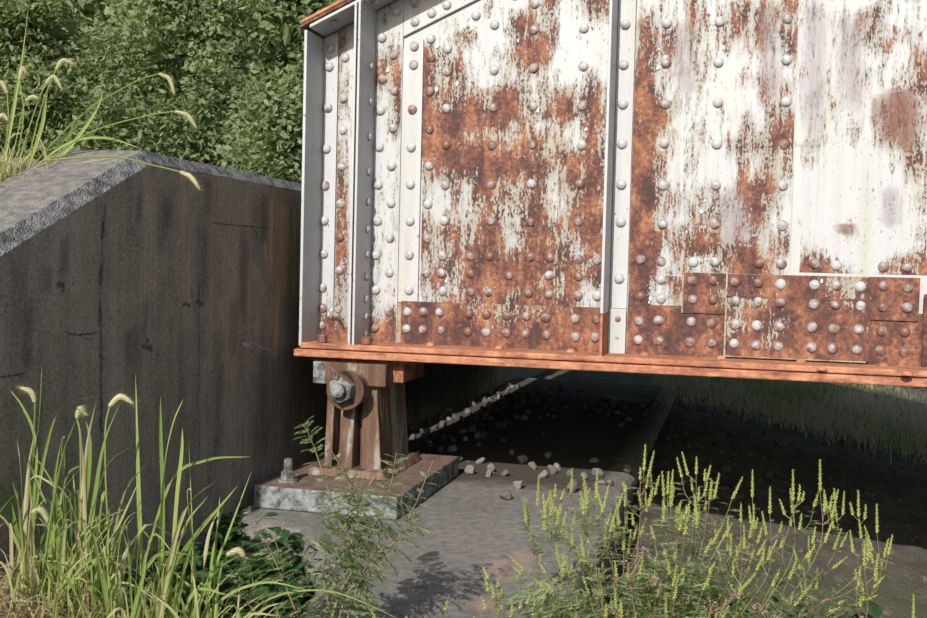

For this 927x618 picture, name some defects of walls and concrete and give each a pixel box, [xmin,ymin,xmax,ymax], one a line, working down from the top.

rust [320,27,352,341]
rust [370,0,610,352]
rust [626,0,927,367]